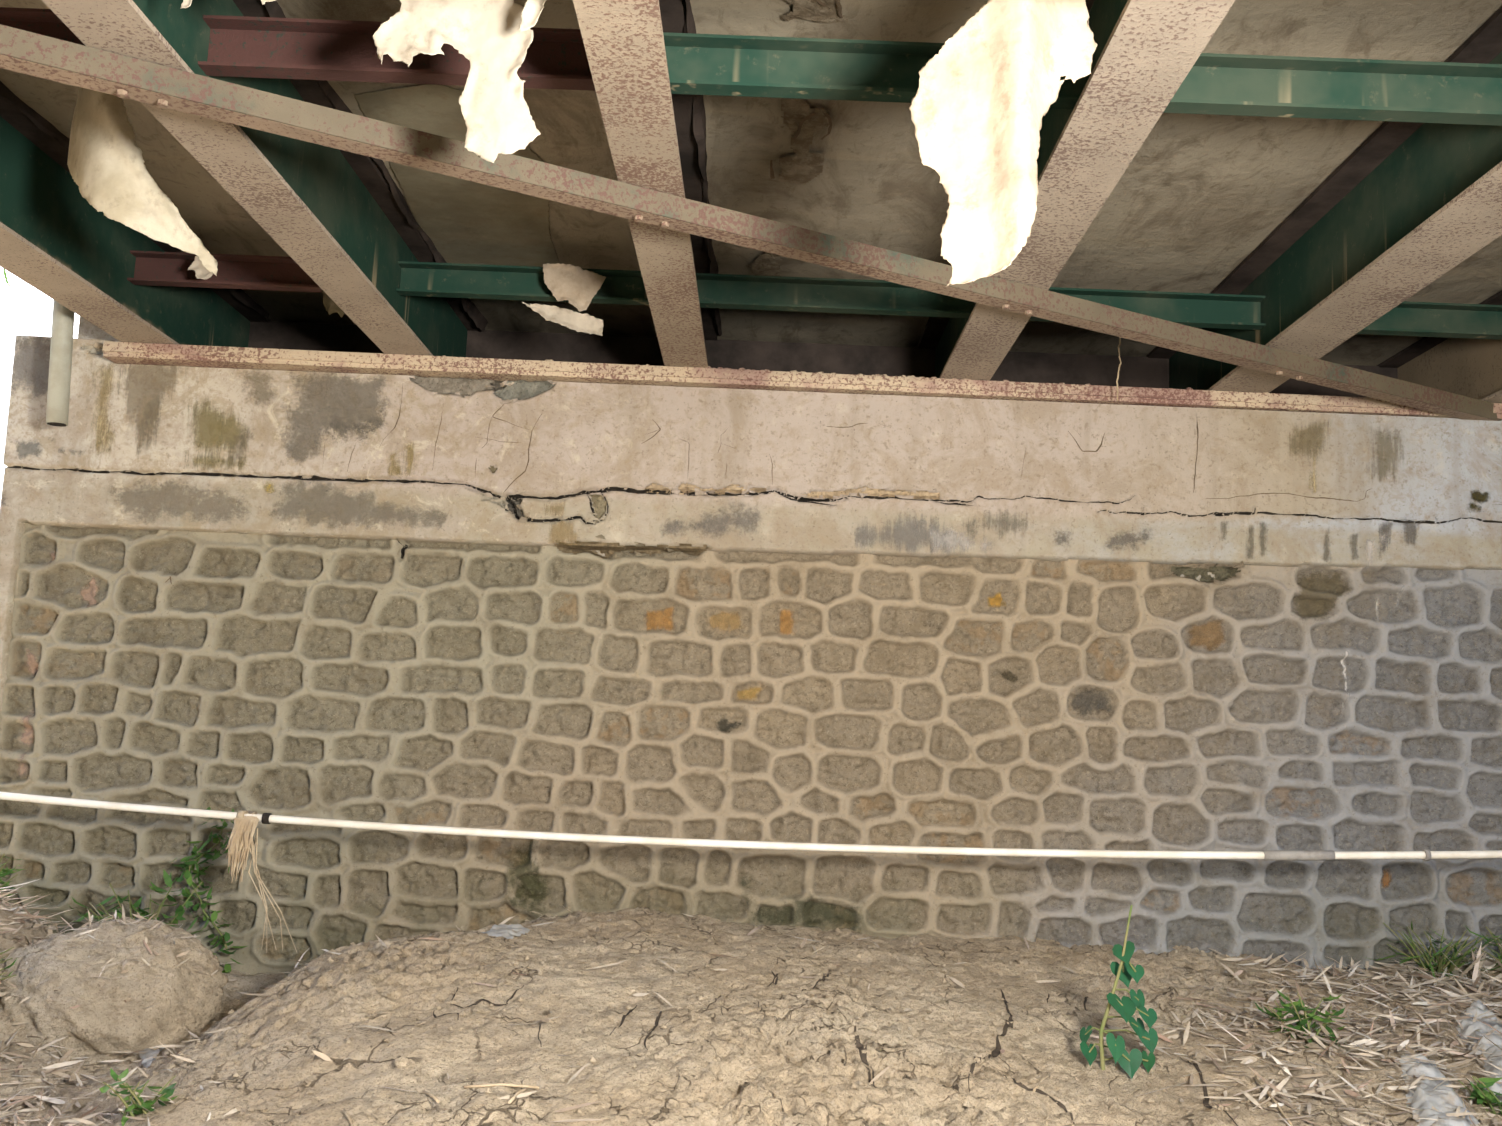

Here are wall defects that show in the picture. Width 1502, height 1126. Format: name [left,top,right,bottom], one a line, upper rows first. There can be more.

water stain [17,442,41,458]
water stain [128,365,176,447]
water stain [194,457,244,469]
water stain [286,373,384,461]
crack [6,386,1502,524]